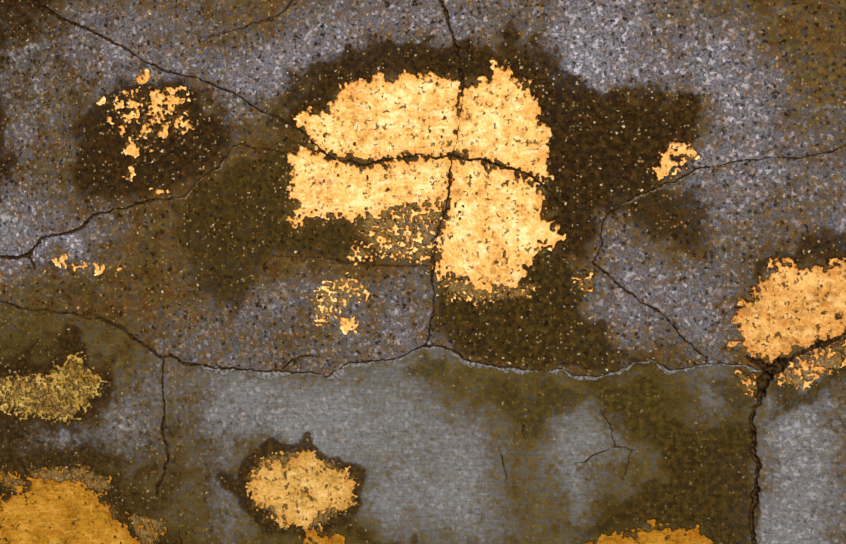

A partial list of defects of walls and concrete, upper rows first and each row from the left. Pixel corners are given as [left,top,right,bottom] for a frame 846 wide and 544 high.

flaking render [96,68,195,182]
crack [0,0,567,345]
flaking render [286,59,567,335]
flaking render [648,141,701,180]
crack [592,145,846,358]
flaking render [0,462,171,544]
flaking render [245,448,360,544]
damp [214,430,423,544]
damp [396,337,458,383]
crack [35,309,846,544]
damp [473,350,846,544]
flaking render [727,257,846,394]